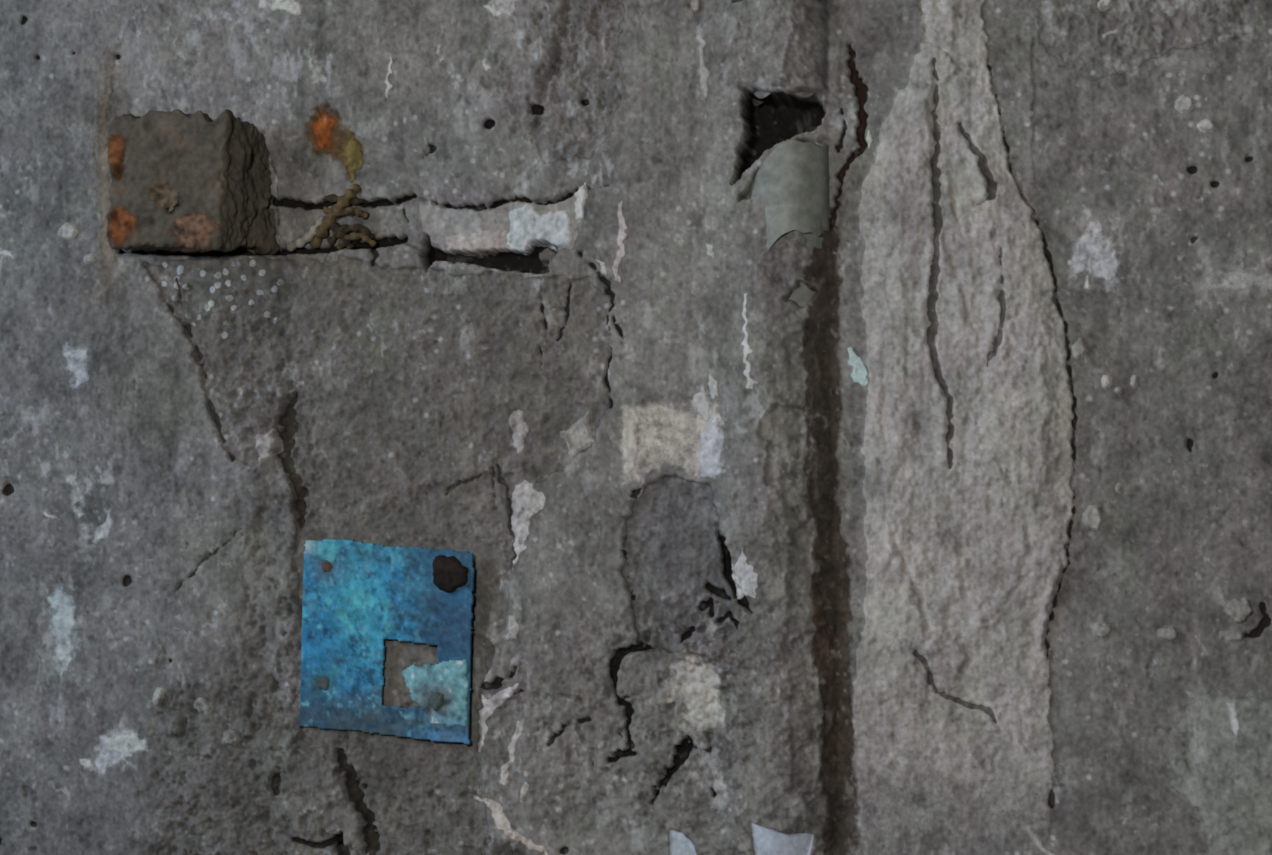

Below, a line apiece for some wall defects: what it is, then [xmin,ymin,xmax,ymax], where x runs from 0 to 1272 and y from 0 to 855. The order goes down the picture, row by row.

corrosion [305,103,363,182]
crack [426,143,436,156]
spalling [741,91,825,174]
crack [120,186,607,462]
crack [540,252,623,408]
crack [987,65,1077,659]
crack [445,464,517,573]
crack [547,718,591,746]
crack [592,642,656,765]
crack [652,736,712,804]